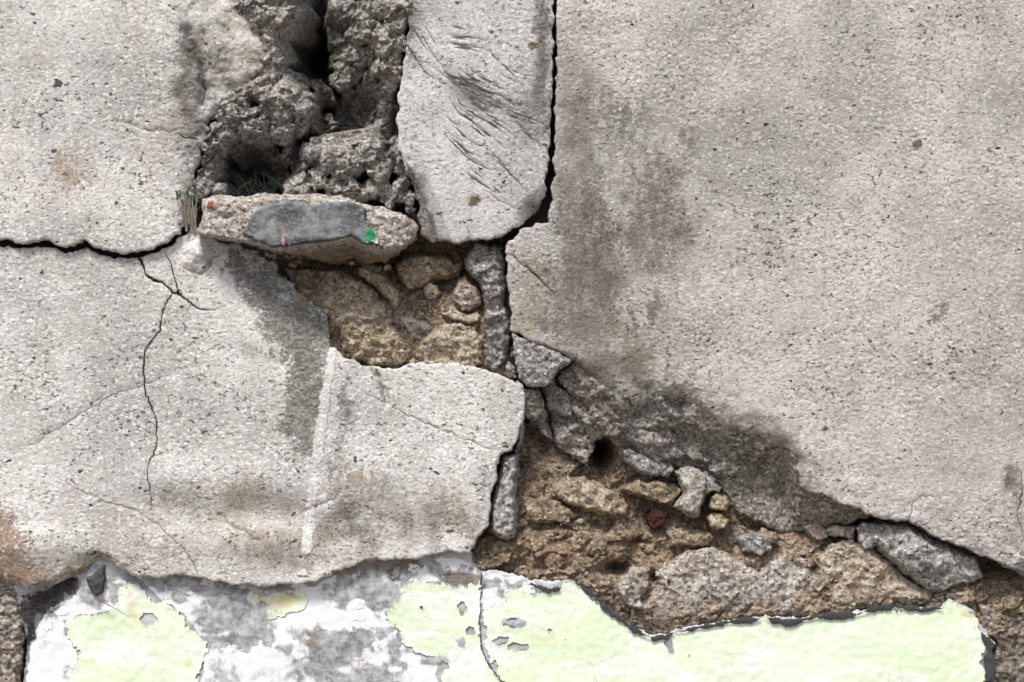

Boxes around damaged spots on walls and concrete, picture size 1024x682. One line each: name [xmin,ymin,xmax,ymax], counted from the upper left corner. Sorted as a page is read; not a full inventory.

spalling [186,0,420,219]
crack [500,0,573,439]
water stain [532,0,552,107]
water stain [536,85,695,344]
crack [0,226,221,574]
spalling [26,224,1024,682]